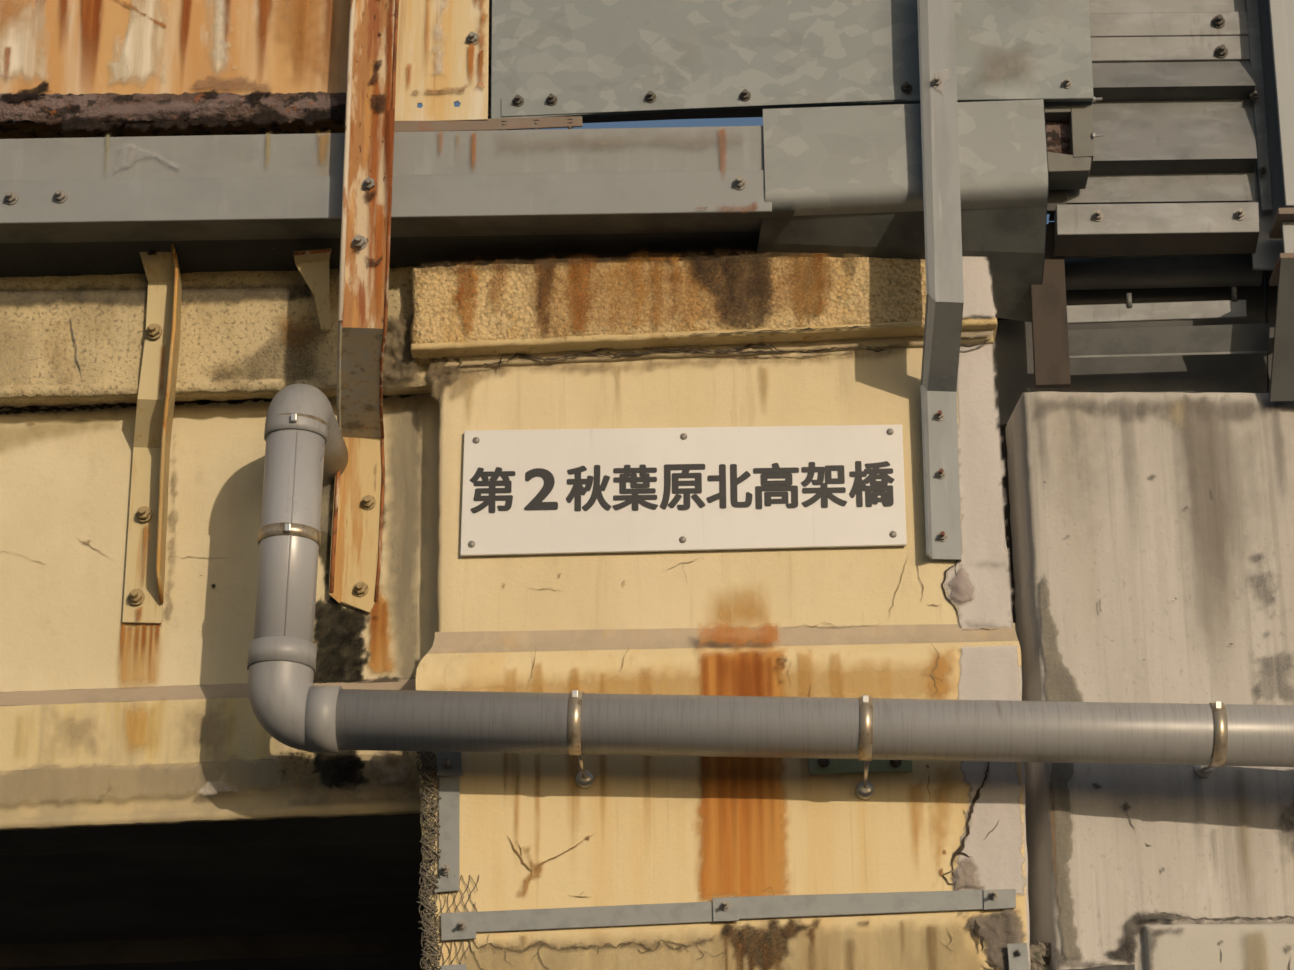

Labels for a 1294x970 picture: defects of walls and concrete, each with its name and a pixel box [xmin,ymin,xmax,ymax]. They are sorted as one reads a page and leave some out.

corrosion [61,0,102,59]
corrosion [369,0,394,313]
water stain [687,249,773,326]
crack [0,325,137,414]
peeling [944,256,1012,629]
water stain [313,532,375,684]
peeling [958,645,1020,701]
water stain [312,750,369,790]
corrosion [699,756,787,900]
crack [942,762,999,890]
peeling [939,761,1026,895]
crack [468,935,726,970]